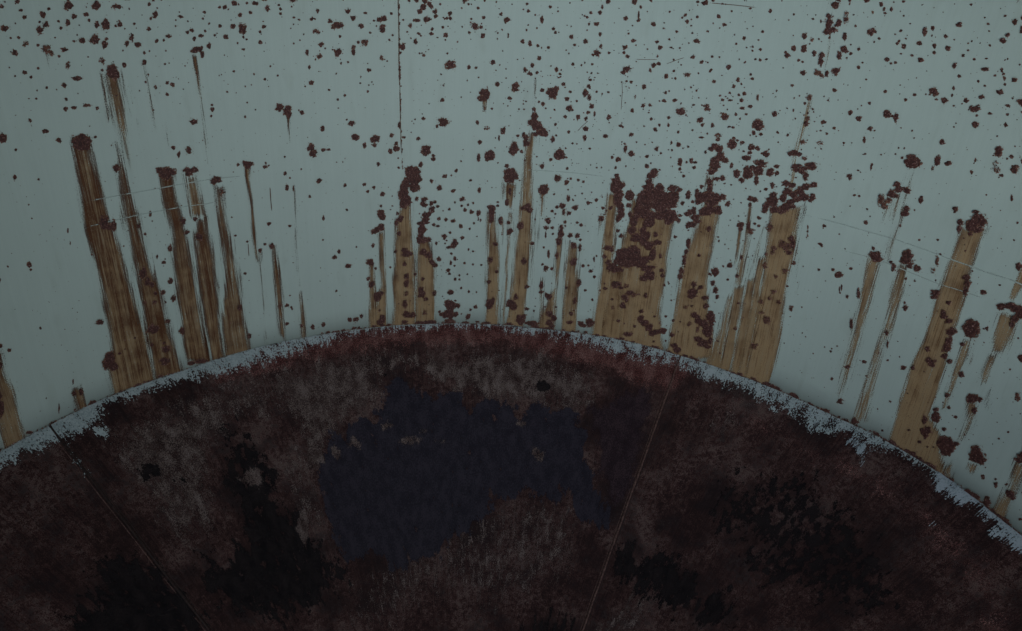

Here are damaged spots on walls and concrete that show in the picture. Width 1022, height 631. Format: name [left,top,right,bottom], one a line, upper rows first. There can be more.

corrosion [662,54,732,83]
peeling [0,323,1022,554]